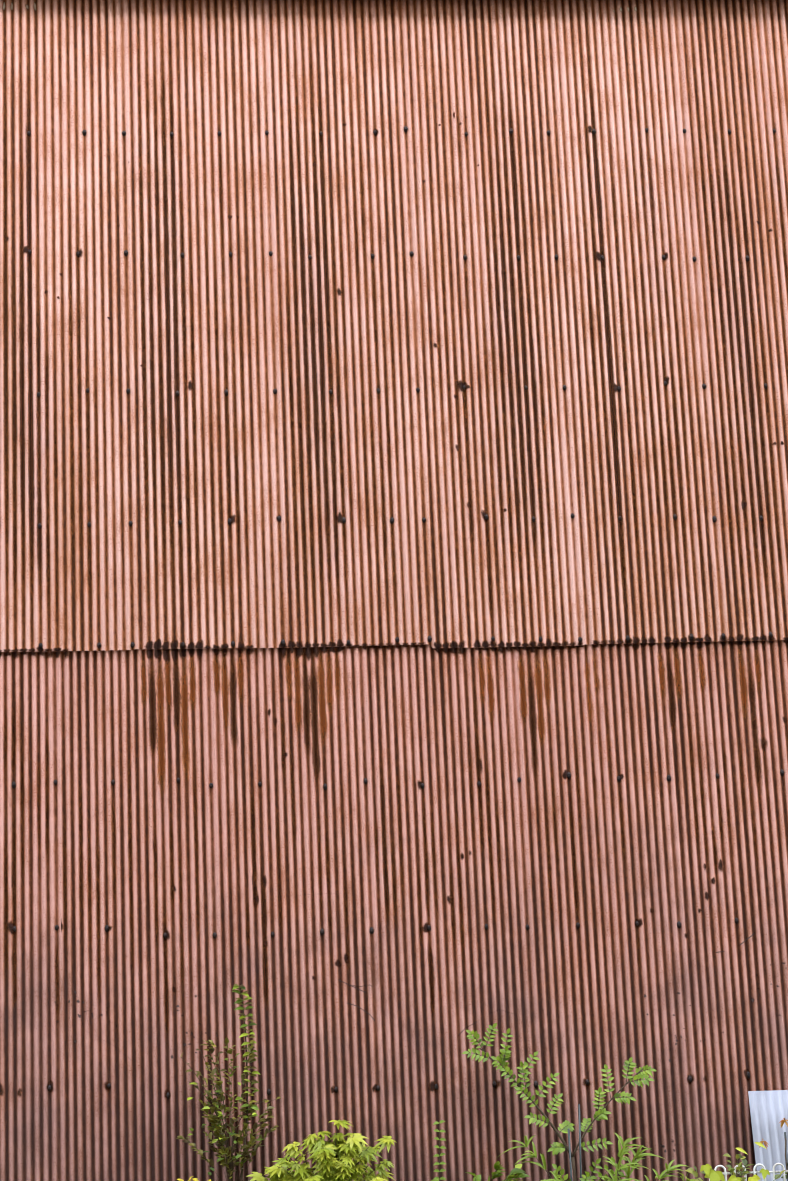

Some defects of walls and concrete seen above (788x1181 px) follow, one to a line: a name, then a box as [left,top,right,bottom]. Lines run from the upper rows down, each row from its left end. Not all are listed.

rust [0,647,69,659]
rust [141,639,254,784]
rust [153,826,184,1030]